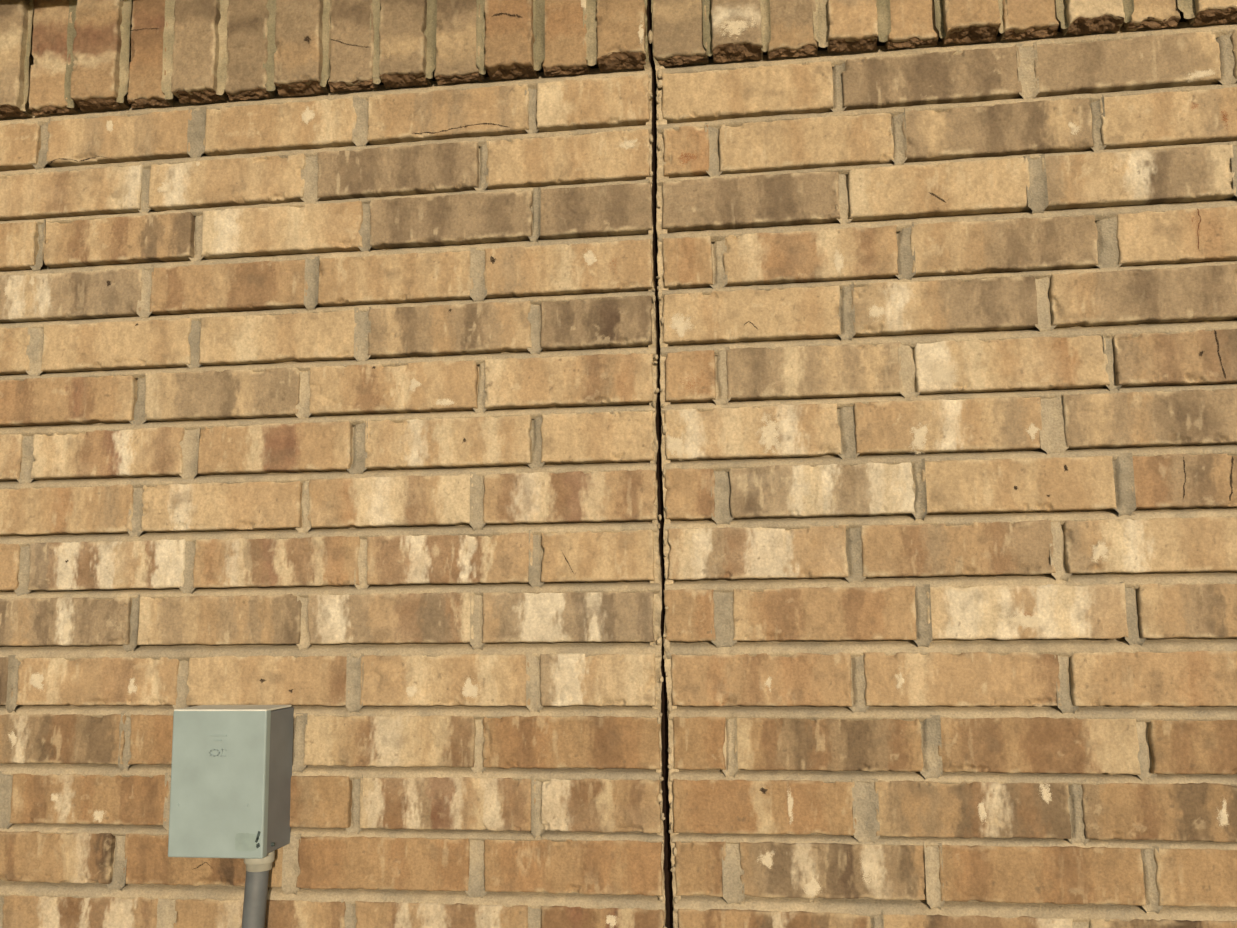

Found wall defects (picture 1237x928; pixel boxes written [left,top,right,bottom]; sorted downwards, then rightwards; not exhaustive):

crack [647,0,679,928]